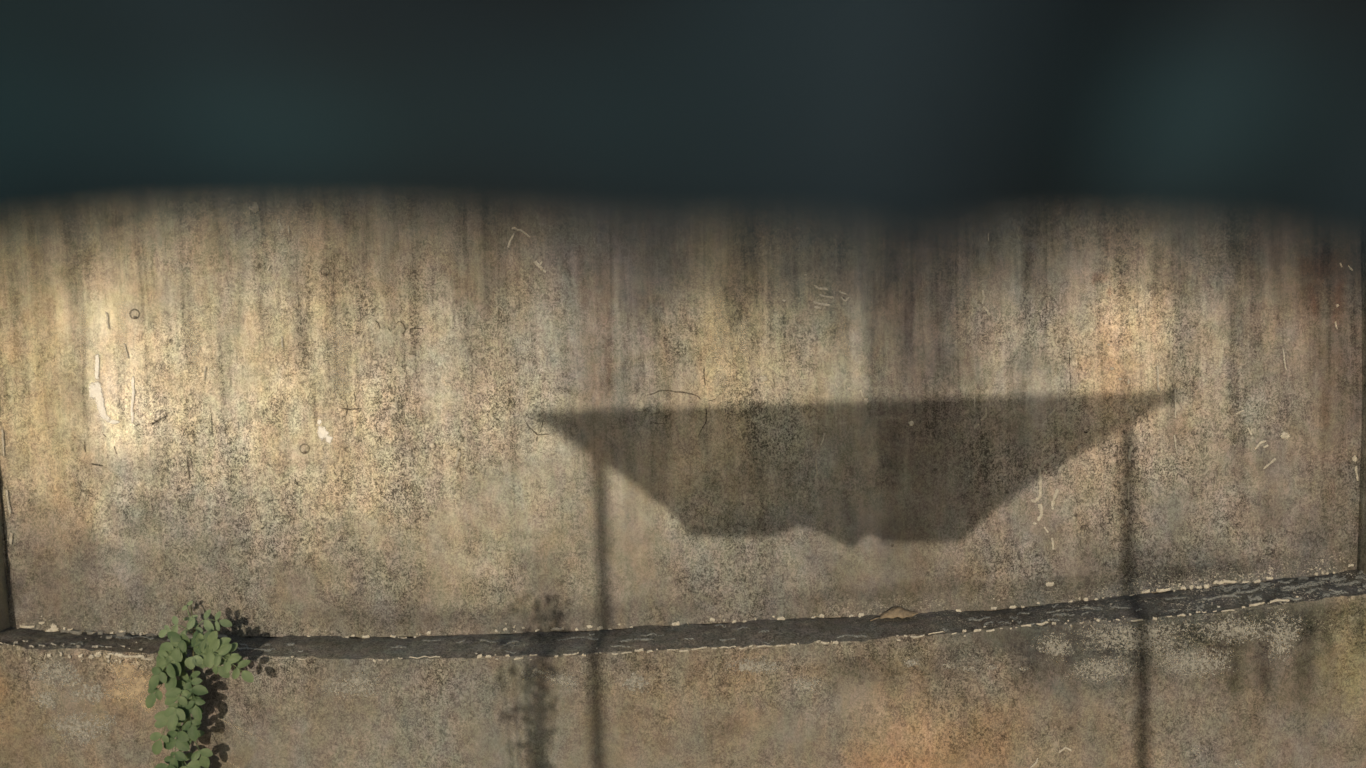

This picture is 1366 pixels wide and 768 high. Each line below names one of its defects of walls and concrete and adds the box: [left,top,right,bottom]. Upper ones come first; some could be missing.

efflorescence [89,355,135,424]
damp [317,420,333,444]